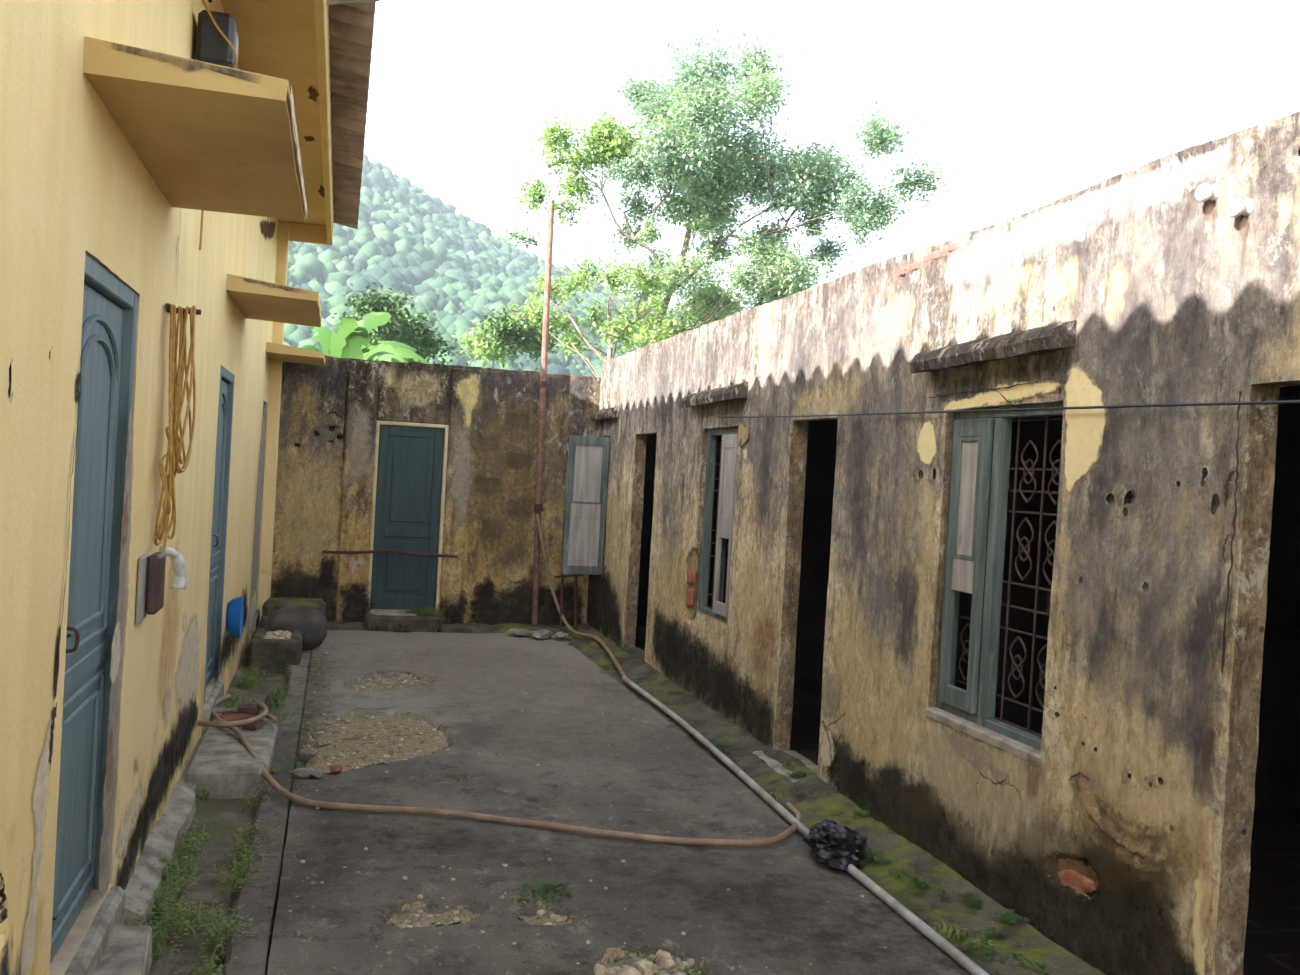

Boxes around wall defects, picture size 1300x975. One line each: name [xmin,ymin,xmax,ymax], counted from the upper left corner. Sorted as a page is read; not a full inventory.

leakage [480,373,592,432]
leakage [1056,175,1248,796]
leakage [271,558,372,622]
leakage [652,608,773,746]
spalling [0,872,8,923]
peeling [6,720,51,975]
leakage [116,692,198,890]
leakage [828,738,1198,975]
spalling [1056,854,1098,894]